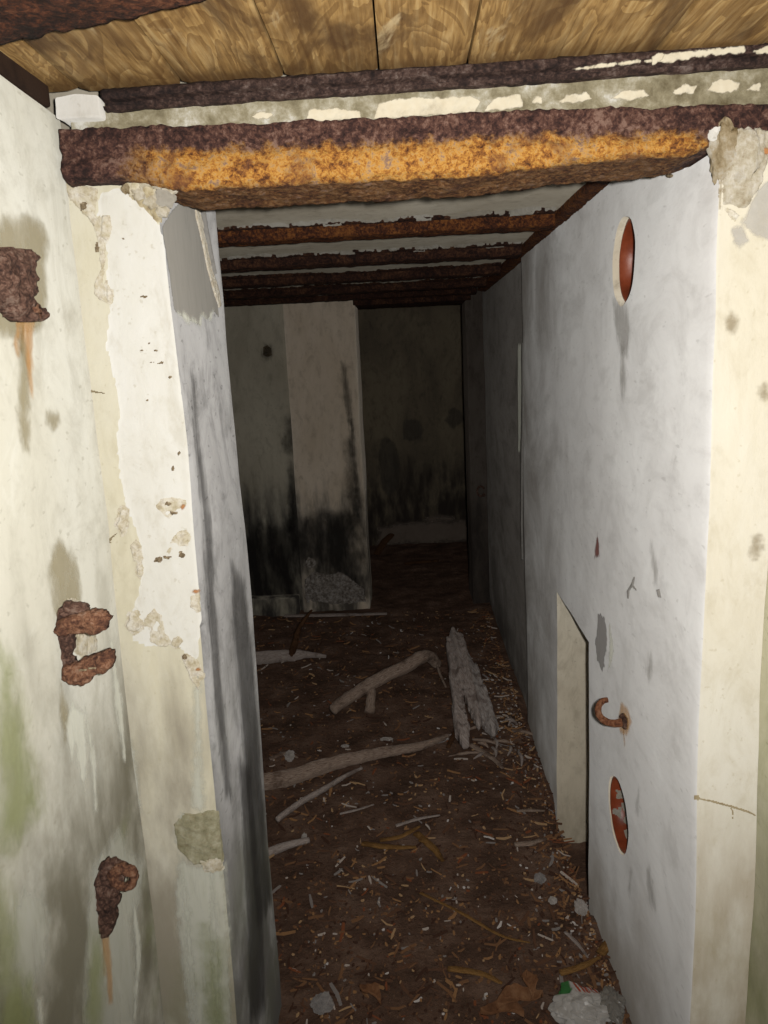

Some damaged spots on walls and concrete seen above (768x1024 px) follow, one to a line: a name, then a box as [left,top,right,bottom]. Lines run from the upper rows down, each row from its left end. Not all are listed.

peeling [307,108,361,121]
peeling [374,94,542,119]
peeling [559,92,592,103]
peeling [611,90,649,101]
peeling [673,79,761,94]
spalling [705,116,768,244]
corrosion [217,207,556,232]
corrosion [222,242,522,261]
corrosion [221,262,501,280]
peeling [66,182,219,689]
leakage [377,516,467,545]
spalling [174,810,225,873]